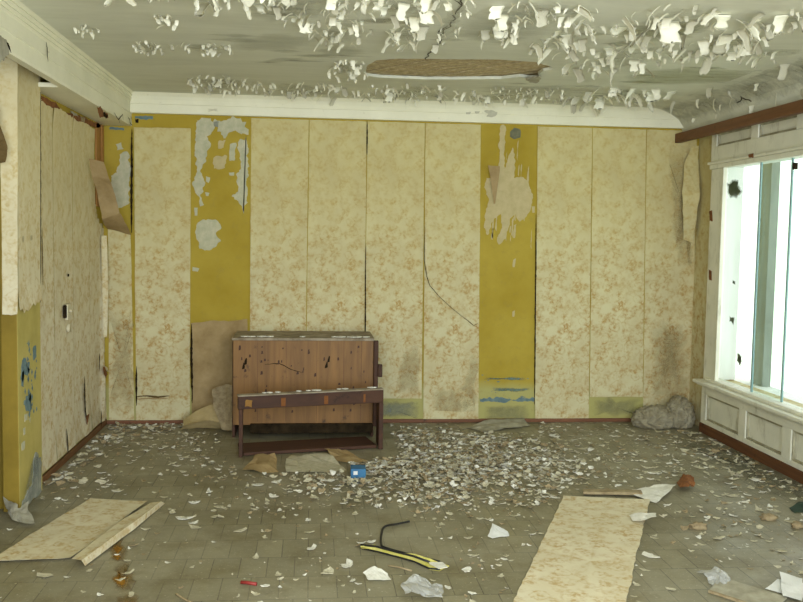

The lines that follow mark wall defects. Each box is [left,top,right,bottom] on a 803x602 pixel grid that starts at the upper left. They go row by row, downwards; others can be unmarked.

peeling [73,25,100,40]
peeling [154,14,179,31]
peeling [132,40,233,57]
crack [425,0,463,60]
flaking render [187,0,803,117]
flaking render [97,106,124,130]
peeling [692,87,735,123]
peeling [111,143,131,208]
peeling [192,116,249,250]
peeling [484,125,535,244]
peeling [21,342,37,450]
flaking render [21,452,42,507]